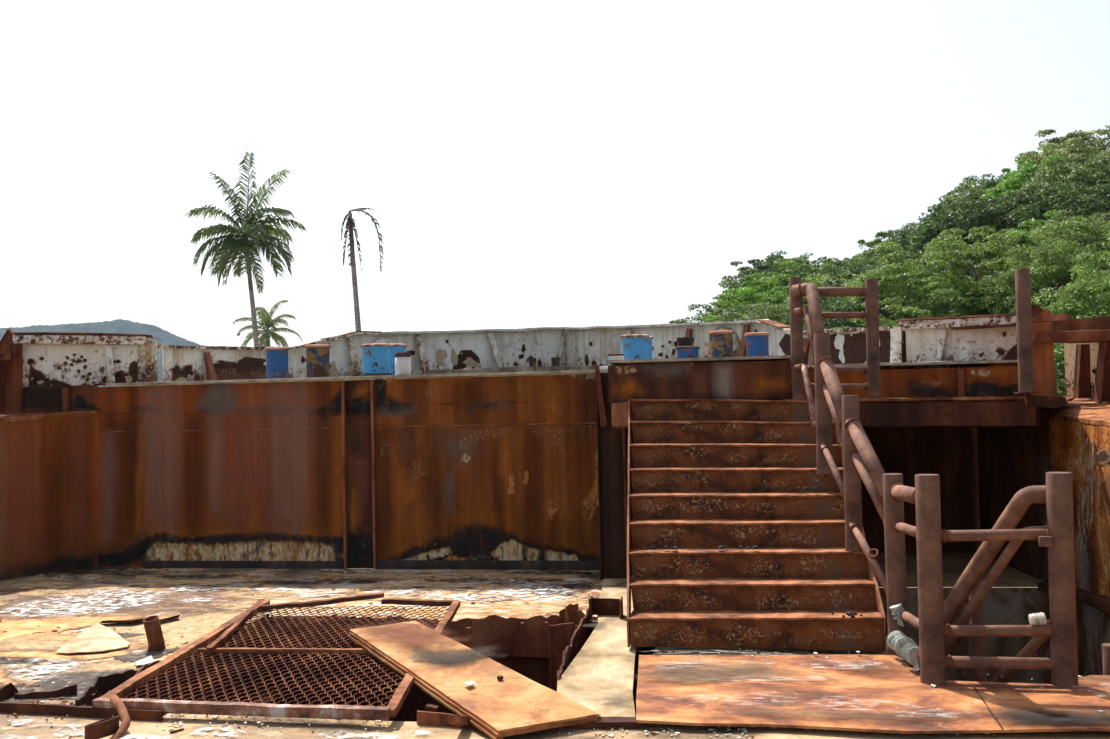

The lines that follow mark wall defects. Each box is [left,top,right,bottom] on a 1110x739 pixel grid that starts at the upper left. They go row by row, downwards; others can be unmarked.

peeling [23,354,138,387]
peeling [172,364,201,381]
peeling [213,356,266,380]
peeling [436,339,482,380]
peeling [514,344,542,367]
corrosion [136,428,342,539]
damp [0,567,600,617]